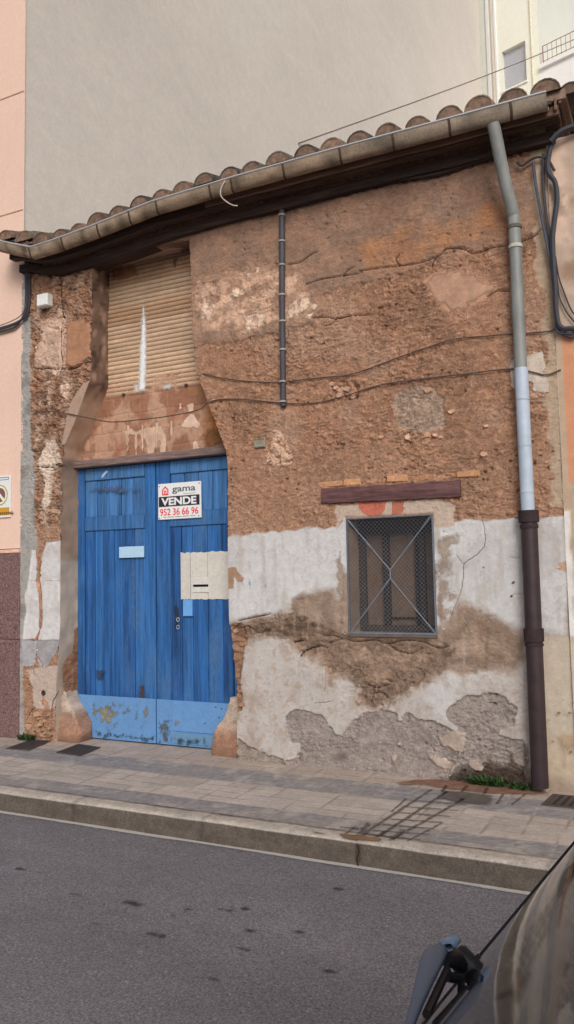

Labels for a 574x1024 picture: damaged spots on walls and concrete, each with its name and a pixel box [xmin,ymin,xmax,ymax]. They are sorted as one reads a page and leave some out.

crack [289,230,541,285]
peeling [179,403,200,449]
flaking render [231,554,529,780]
crack [294,514,486,703]